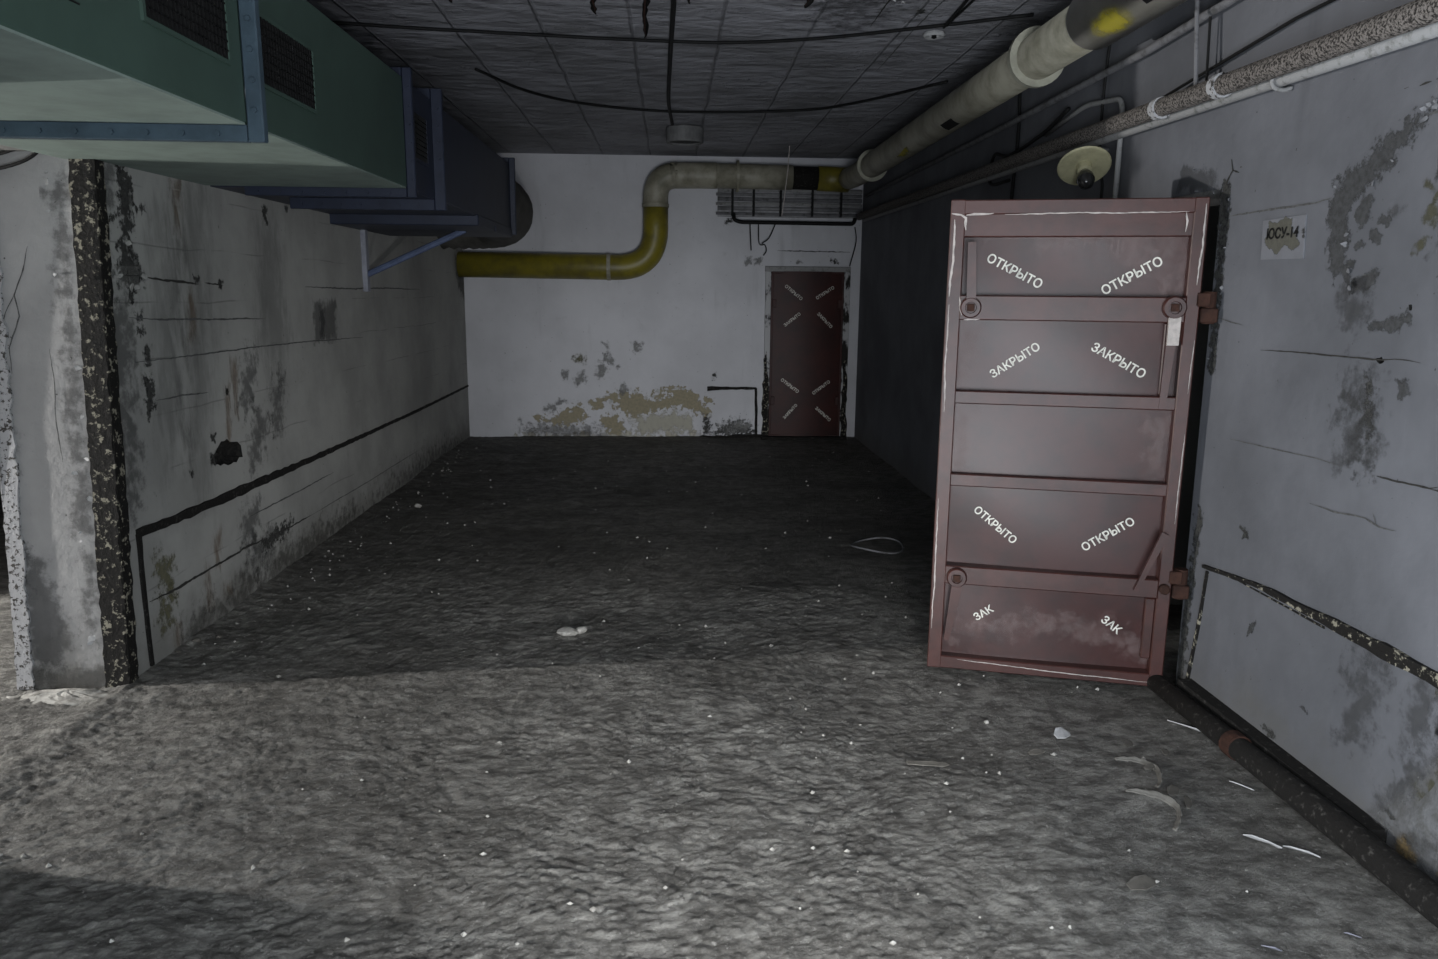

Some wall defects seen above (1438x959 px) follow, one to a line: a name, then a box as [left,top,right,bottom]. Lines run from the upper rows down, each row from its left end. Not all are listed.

peeling [1325,98,1438,295]
peeling [1367,304,1412,334]
peeling [515,373,717,437]
damp [1360,376,1375,440]
damp [1394,379,1410,401]